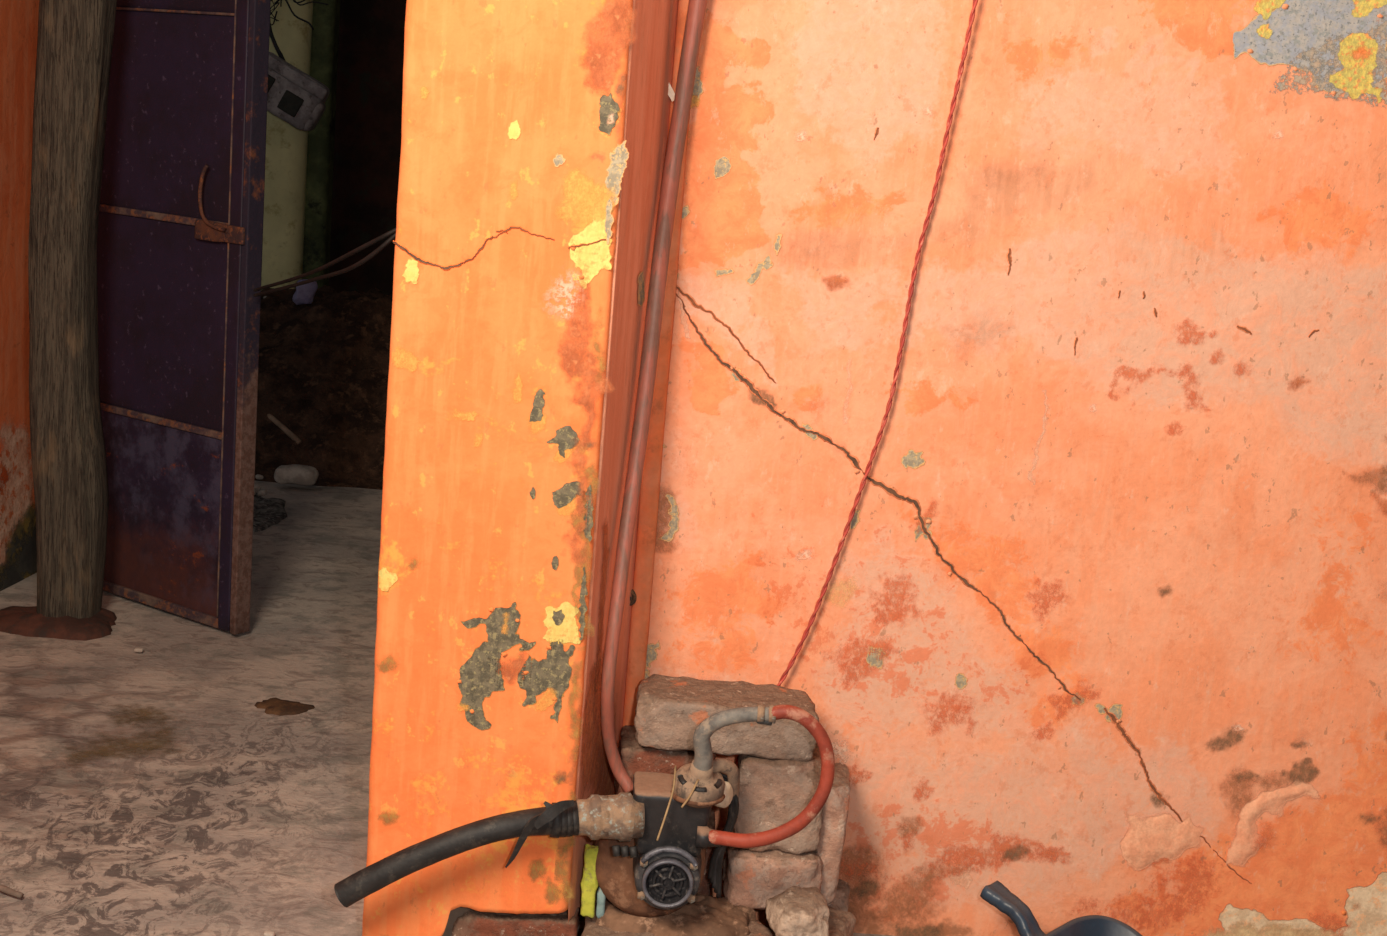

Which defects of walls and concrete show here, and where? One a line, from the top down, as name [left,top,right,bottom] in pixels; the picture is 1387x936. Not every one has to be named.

peeling [1232,0,1387,107]
crack [393,226,606,271]
damp [0,424,37,591]
peeling [456,467,597,737]
crack [676,286,1252,884]
flaking render [1208,872,1387,936]